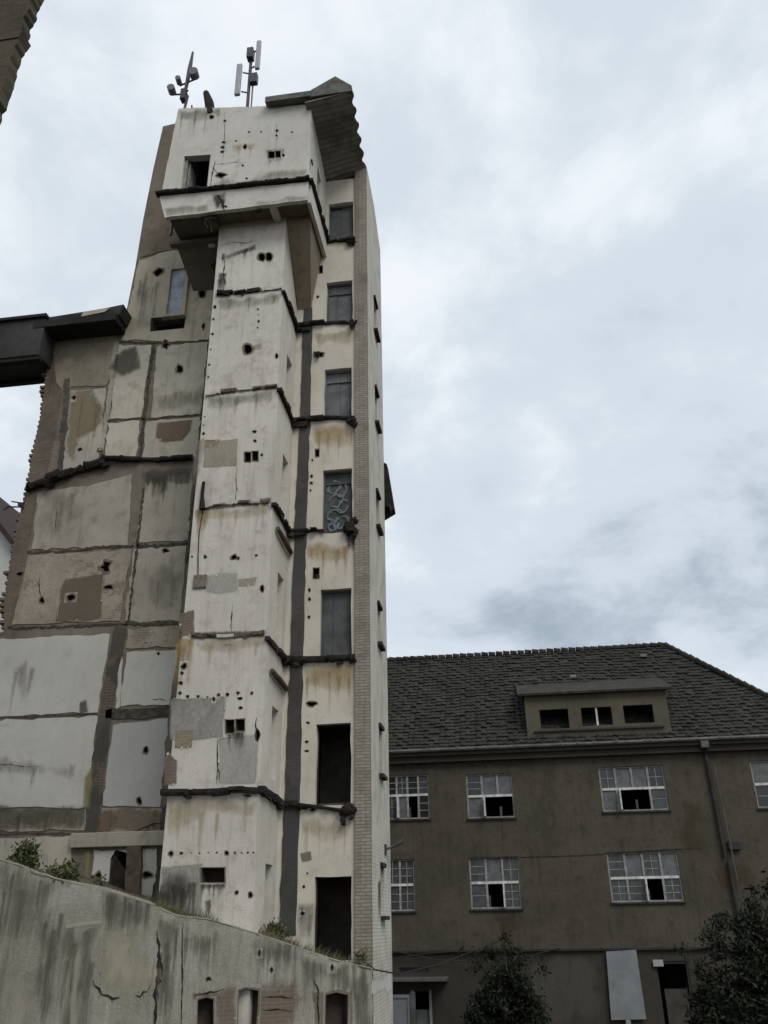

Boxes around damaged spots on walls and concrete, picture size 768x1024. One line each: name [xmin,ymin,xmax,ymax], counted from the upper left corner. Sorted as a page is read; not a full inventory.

leakage [45,915,92,1024]
crack [93,923,223,1024]